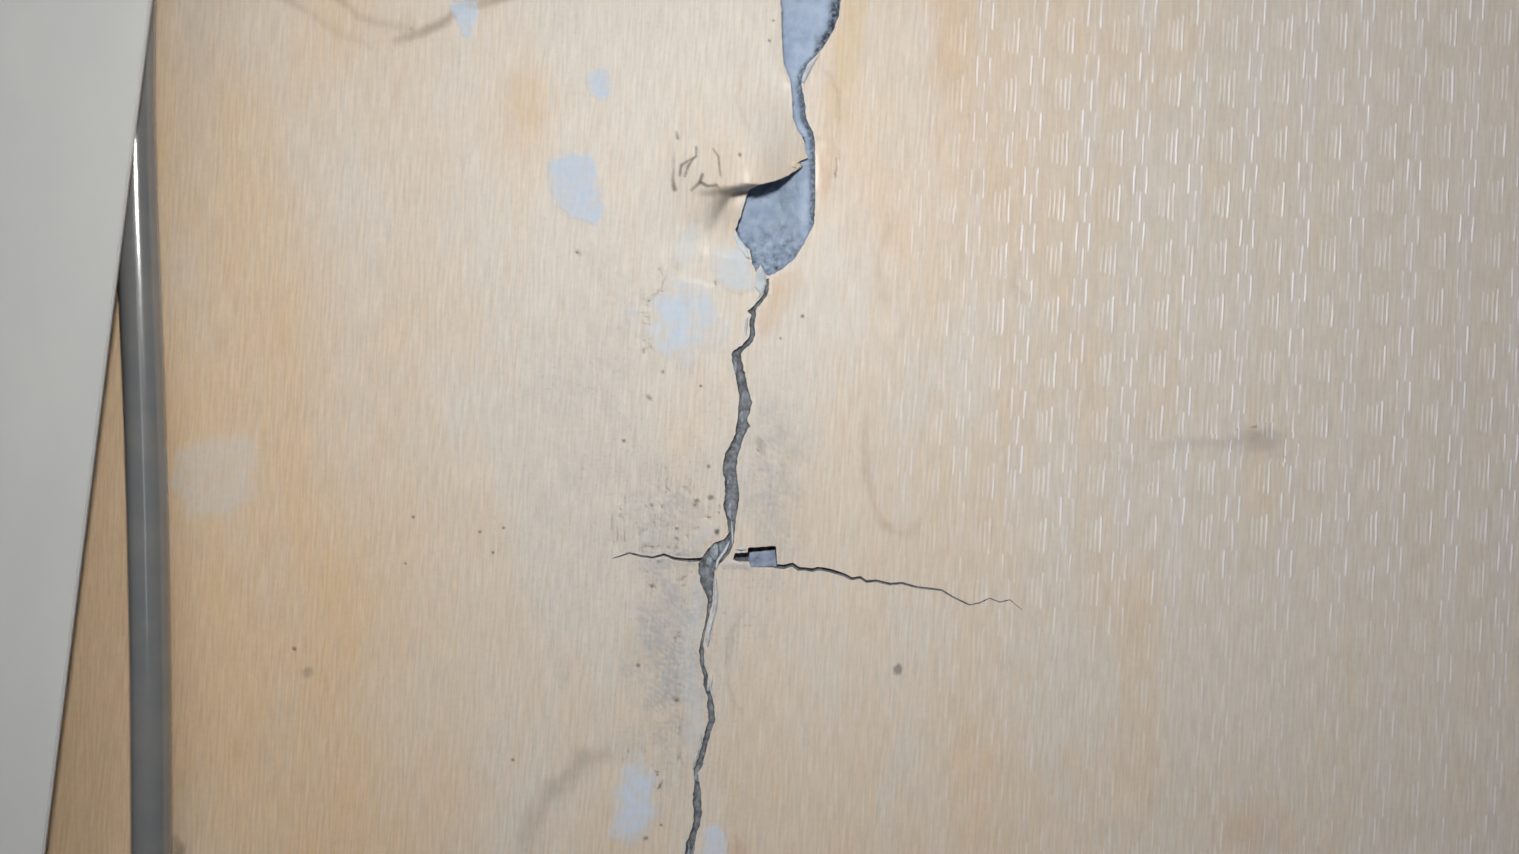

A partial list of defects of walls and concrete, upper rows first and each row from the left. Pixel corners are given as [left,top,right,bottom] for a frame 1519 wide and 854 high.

peeling [544,148,608,230]
flaking render [706,0,841,298]
crack [613,278,1022,854]
peeling [600,750,664,854]
peeling [698,821,730,854]